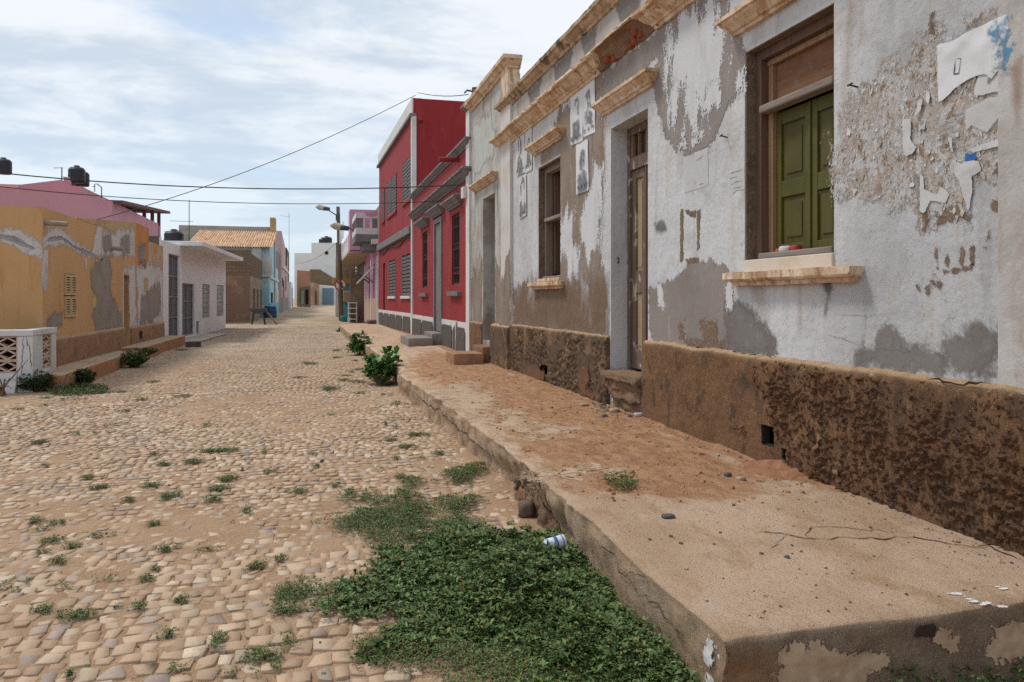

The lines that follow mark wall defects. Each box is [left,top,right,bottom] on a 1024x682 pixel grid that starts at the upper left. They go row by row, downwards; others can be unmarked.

peeling [500,0,747,335]
peeling [820,6,998,235]
peeling [0,226,163,331]
spalling [648,257,1024,556]
crack [741,526,1021,560]
peeling [769,639,890,682]
peeling [915,624,960,655]
peeling [978,620,1024,666]